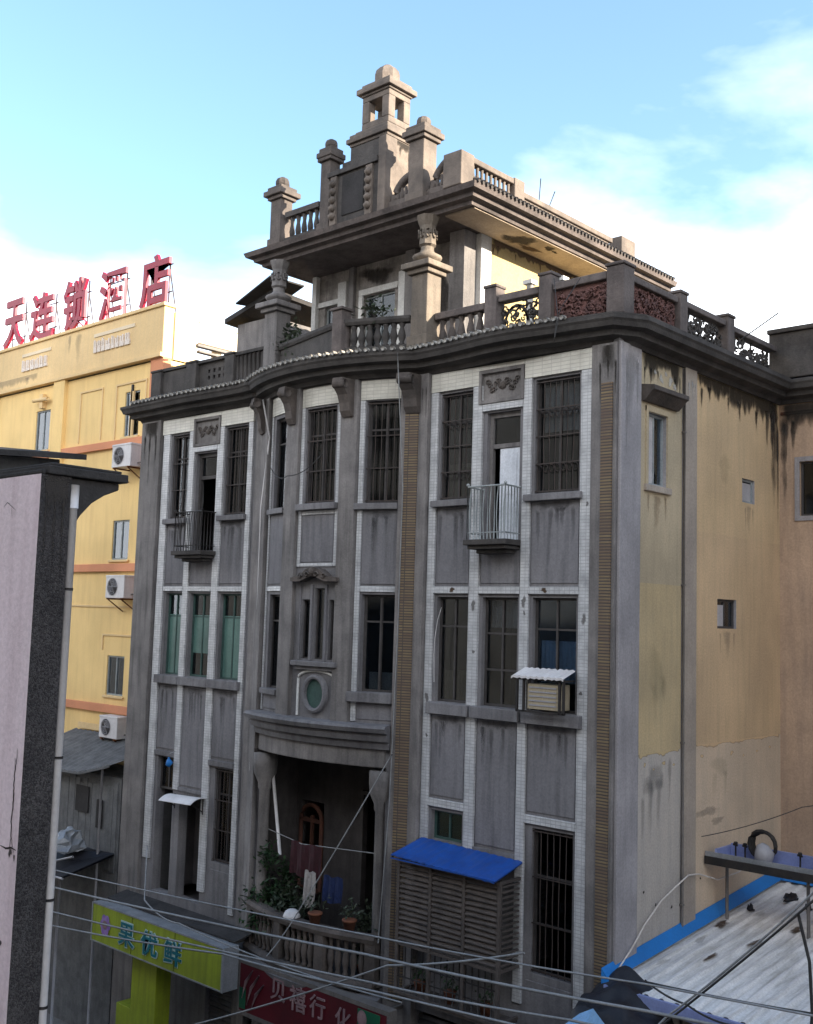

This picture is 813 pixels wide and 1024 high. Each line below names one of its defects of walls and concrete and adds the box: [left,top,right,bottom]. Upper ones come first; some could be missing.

leakage [492,235,577,278]
leakage [644,353,681,393]
leakage [698,374,813,479]